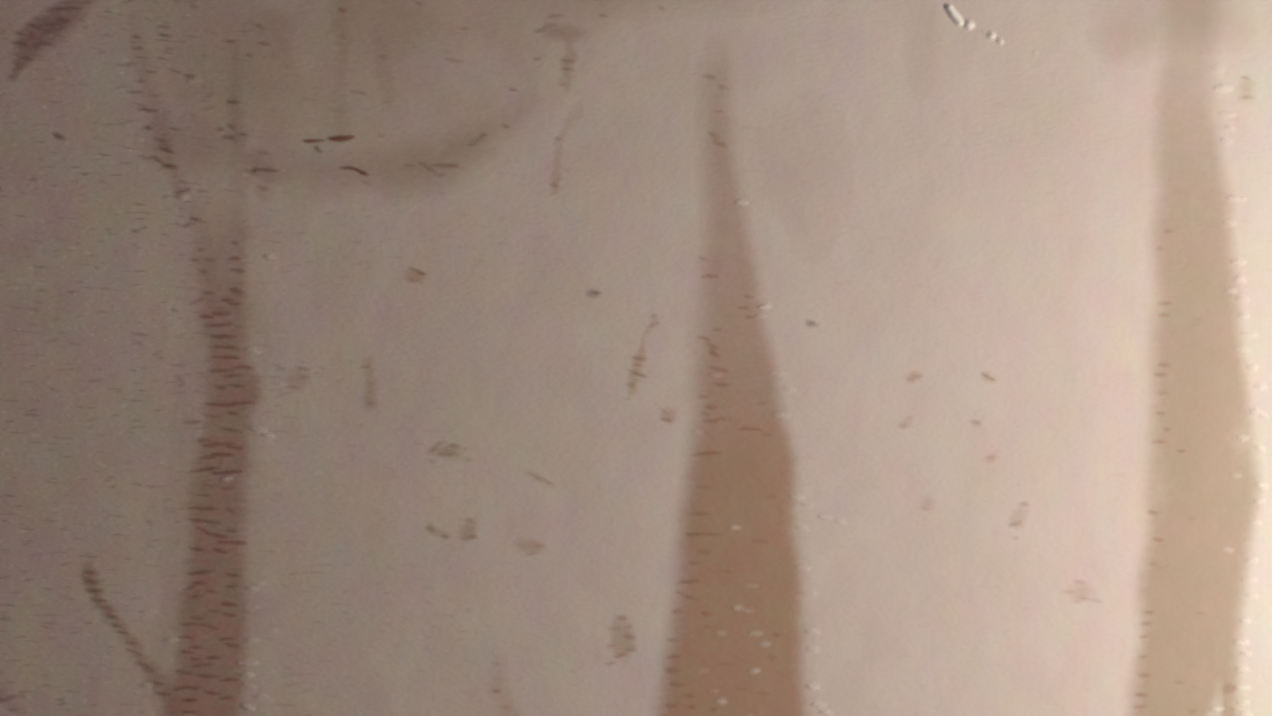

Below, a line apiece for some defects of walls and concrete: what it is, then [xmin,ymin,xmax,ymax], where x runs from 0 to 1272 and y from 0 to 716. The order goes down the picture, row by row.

water stain [1140,240,1264,716]